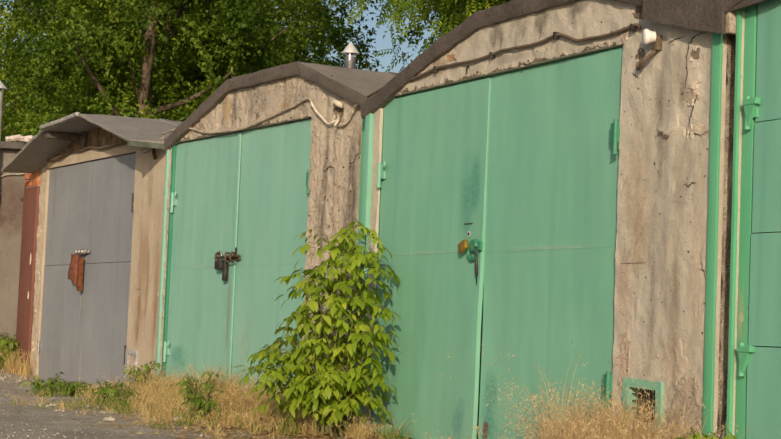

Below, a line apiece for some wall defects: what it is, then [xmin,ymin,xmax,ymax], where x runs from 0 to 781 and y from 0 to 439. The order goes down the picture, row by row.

spalling [632,5,644,20]
spalling [396,30,629,96]
spalling [635,48,647,67]
crack [669,31,708,136]
spalling [178,93,234,142]
spalling [332,97,345,124]